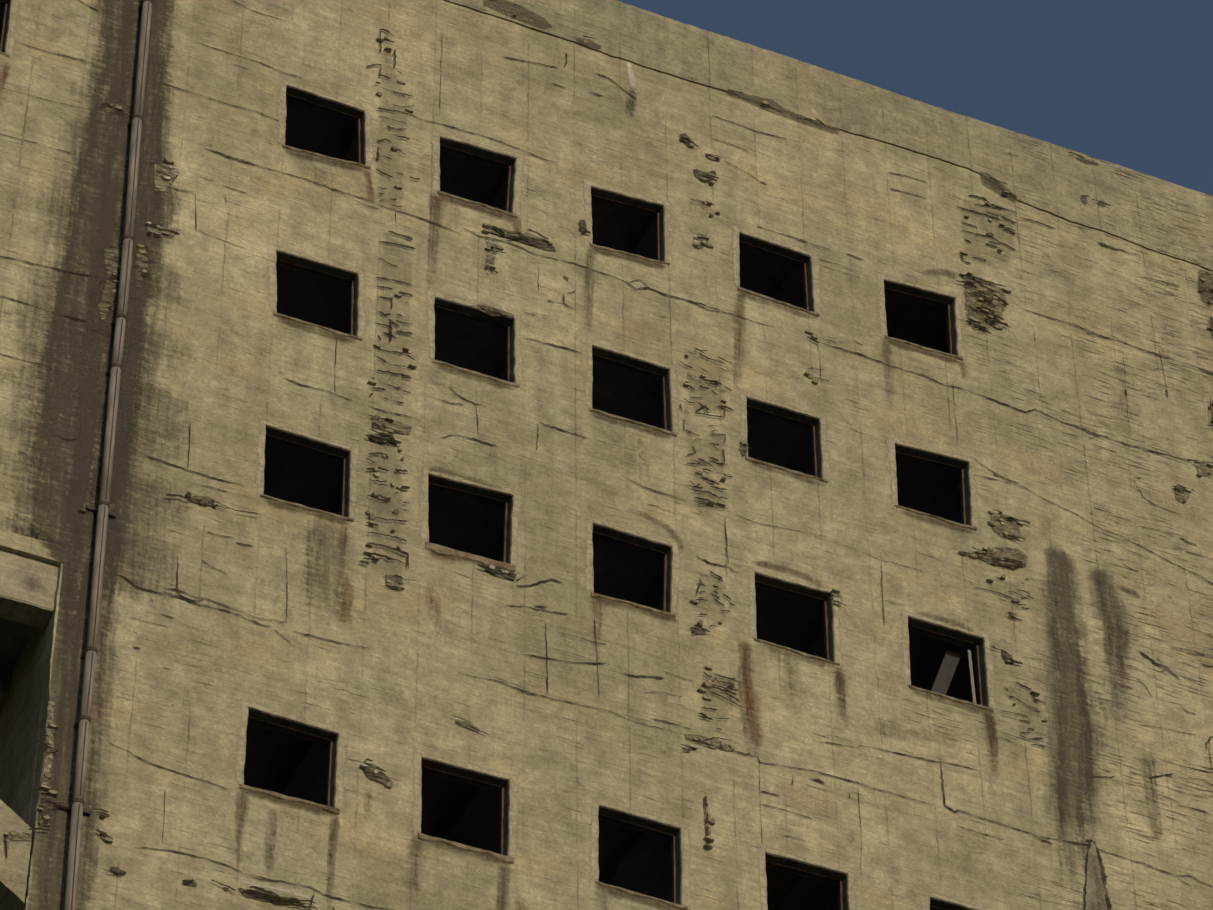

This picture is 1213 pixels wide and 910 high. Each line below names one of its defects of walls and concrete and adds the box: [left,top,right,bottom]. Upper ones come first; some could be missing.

crack [504,53,637,100]
spalling [956,172,1055,334]
spalling [367,258,417,404]
damp [13,0,179,910]
crack [111,532,368,649]
spalling [359,414,416,591]
spalling [680,347,752,513]
spalling [958,509,1033,621]
damp [1047,549,1102,835]
damp [1092,570,1137,687]
spalling [182,879,318,909]
damp [242,881,309,898]